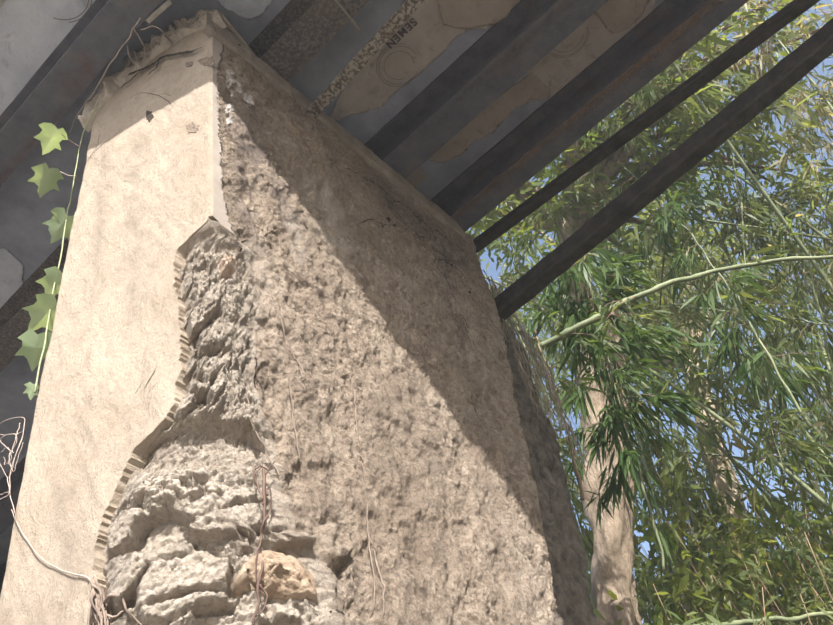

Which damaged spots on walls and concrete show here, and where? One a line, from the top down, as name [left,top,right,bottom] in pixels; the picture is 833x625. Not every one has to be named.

crack [121,46,205,108]
spalling [186,121,200,133]
peeling [224,70,254,124]
spalling [102,220,343,625]